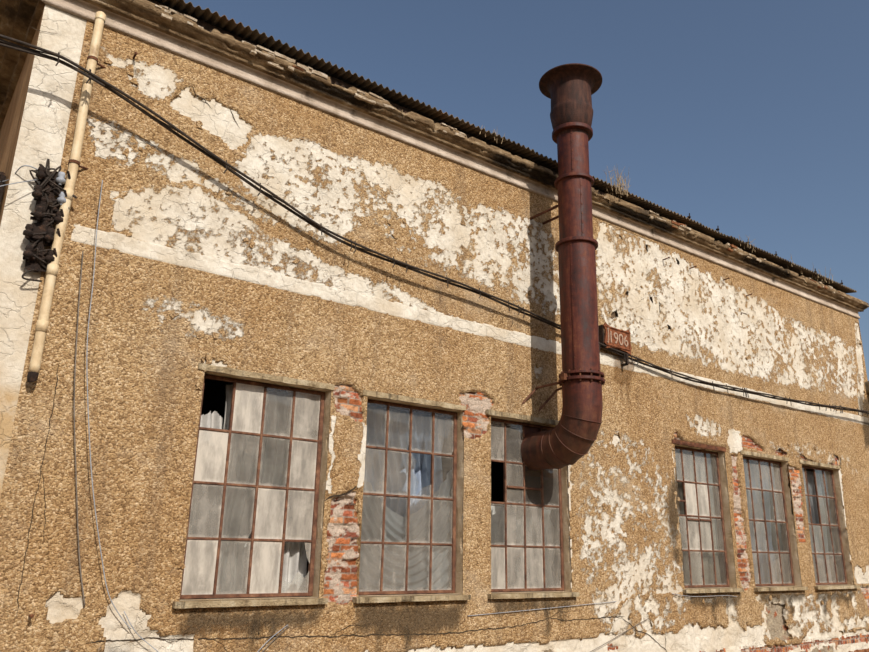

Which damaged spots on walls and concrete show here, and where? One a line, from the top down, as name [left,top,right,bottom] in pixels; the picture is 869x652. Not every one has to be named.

crack [15,360,60,618]
flaking render [33,583,205,652]
flaking render [120,293,367,612]
flaking render [86,40,560,321]
flaking render [456,387,500,444]
flaking render [529,359,546,383]
flaking render [321,411,869,652]
spalling [648,210,691,232]
flaking render [595,220,866,416]